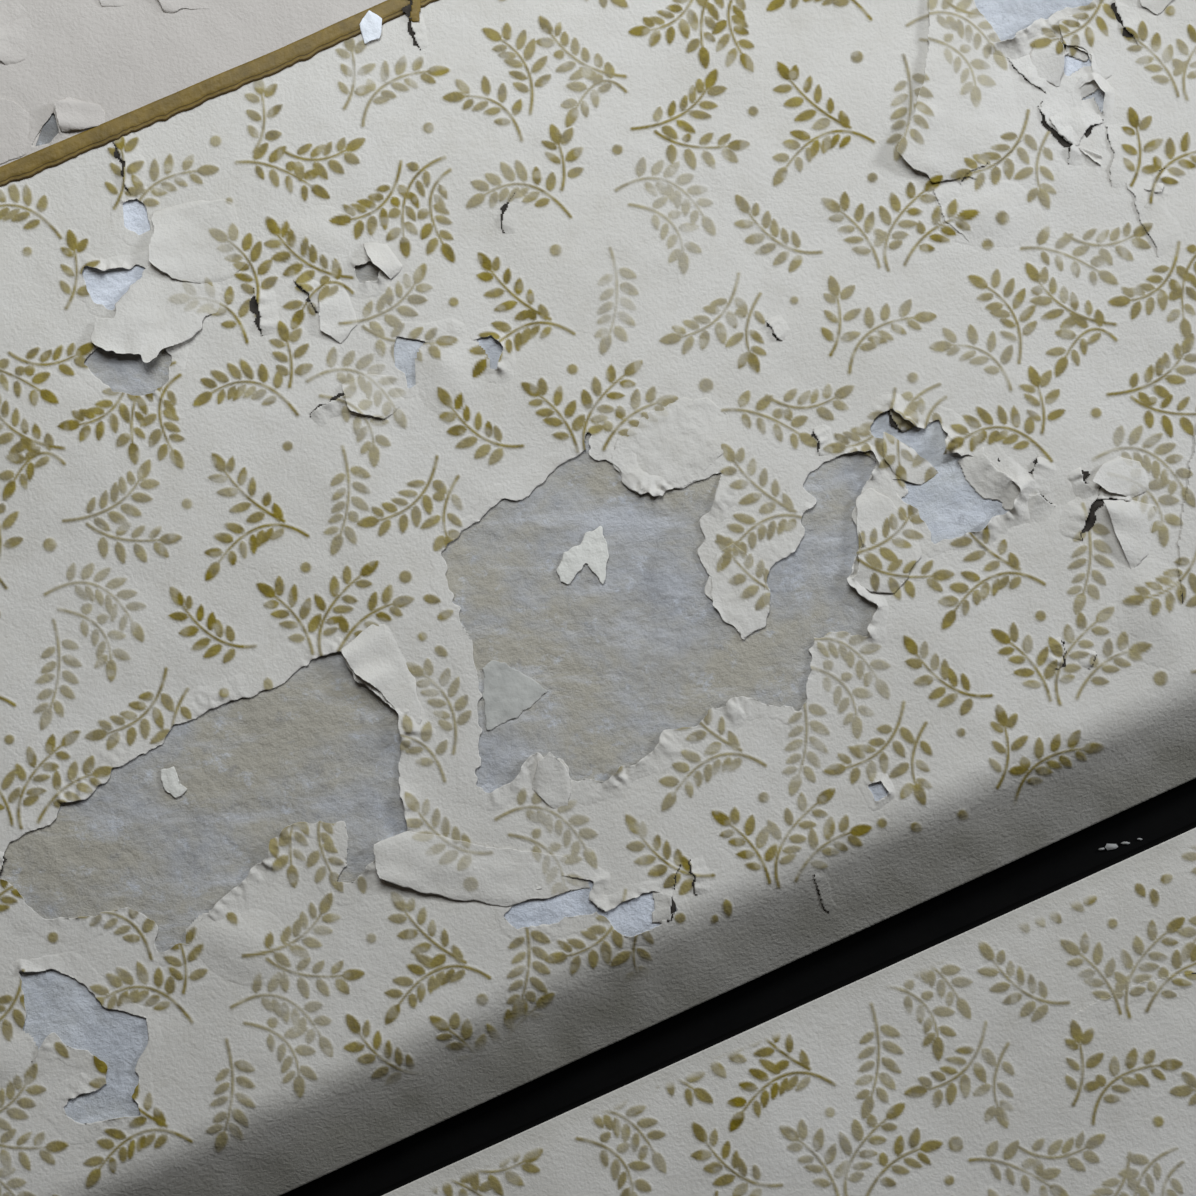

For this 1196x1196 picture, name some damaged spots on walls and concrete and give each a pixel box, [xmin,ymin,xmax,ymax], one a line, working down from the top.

peeling [0,97,105,164]
peeling [897,0,1124,183]
crack [1006,54,1184,258]
crack [1063,0,1159,61]
peeling [68,185,247,409]
peeling [319,242,403,343]
peeling [424,393,1040,811]
peeling [1093,456,1157,569]
crack [1177,435,1196,616]
peeling [0,624,691,1145]